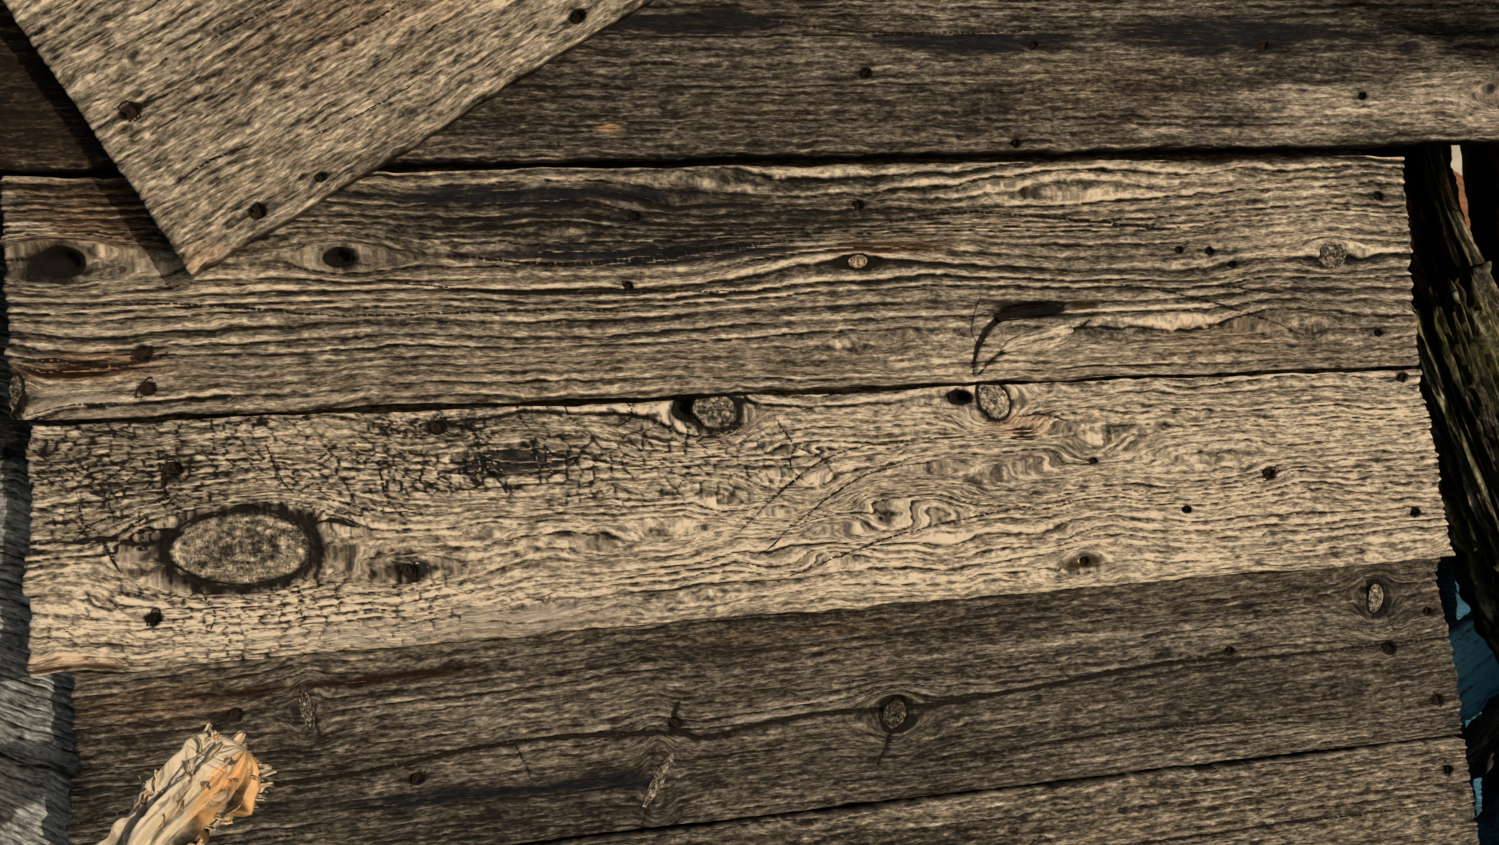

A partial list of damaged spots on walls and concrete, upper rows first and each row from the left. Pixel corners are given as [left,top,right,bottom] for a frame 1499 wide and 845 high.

crack [1093,281,1301,335]
crack [971,296,1089,422]
crack [438,410,526,503]
crack [564,403,632,427]
crack [0,444,402,630]